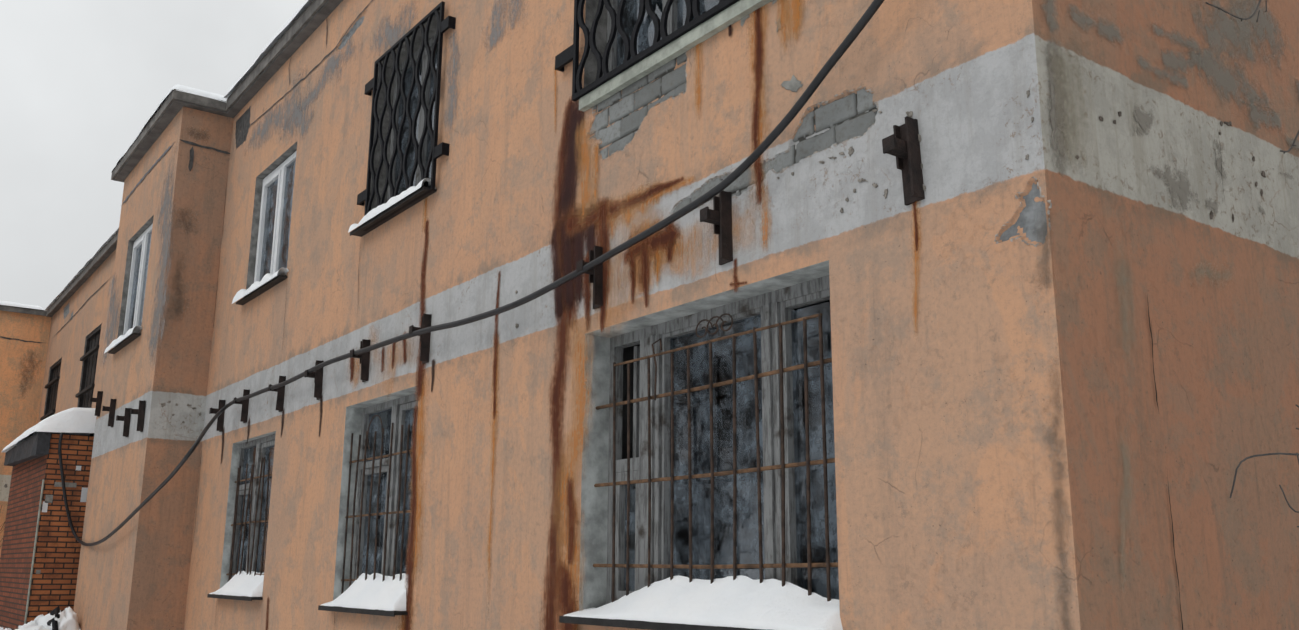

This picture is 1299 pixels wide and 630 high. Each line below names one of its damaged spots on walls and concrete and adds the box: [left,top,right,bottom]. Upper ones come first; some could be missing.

crack [0,282,106,343]
corrosion [381,197,435,630]
corrosion [542,68,690,630]
flaking render [587,52,687,160]
corrosion [750,0,802,246]
flaking render [669,86,888,214]
peeling [780,75,803,92]
corrosion [913,202,921,326]
flaking render [994,177,1052,247]
crack [1147,295,1159,411]
crack [1167,476,1183,630]